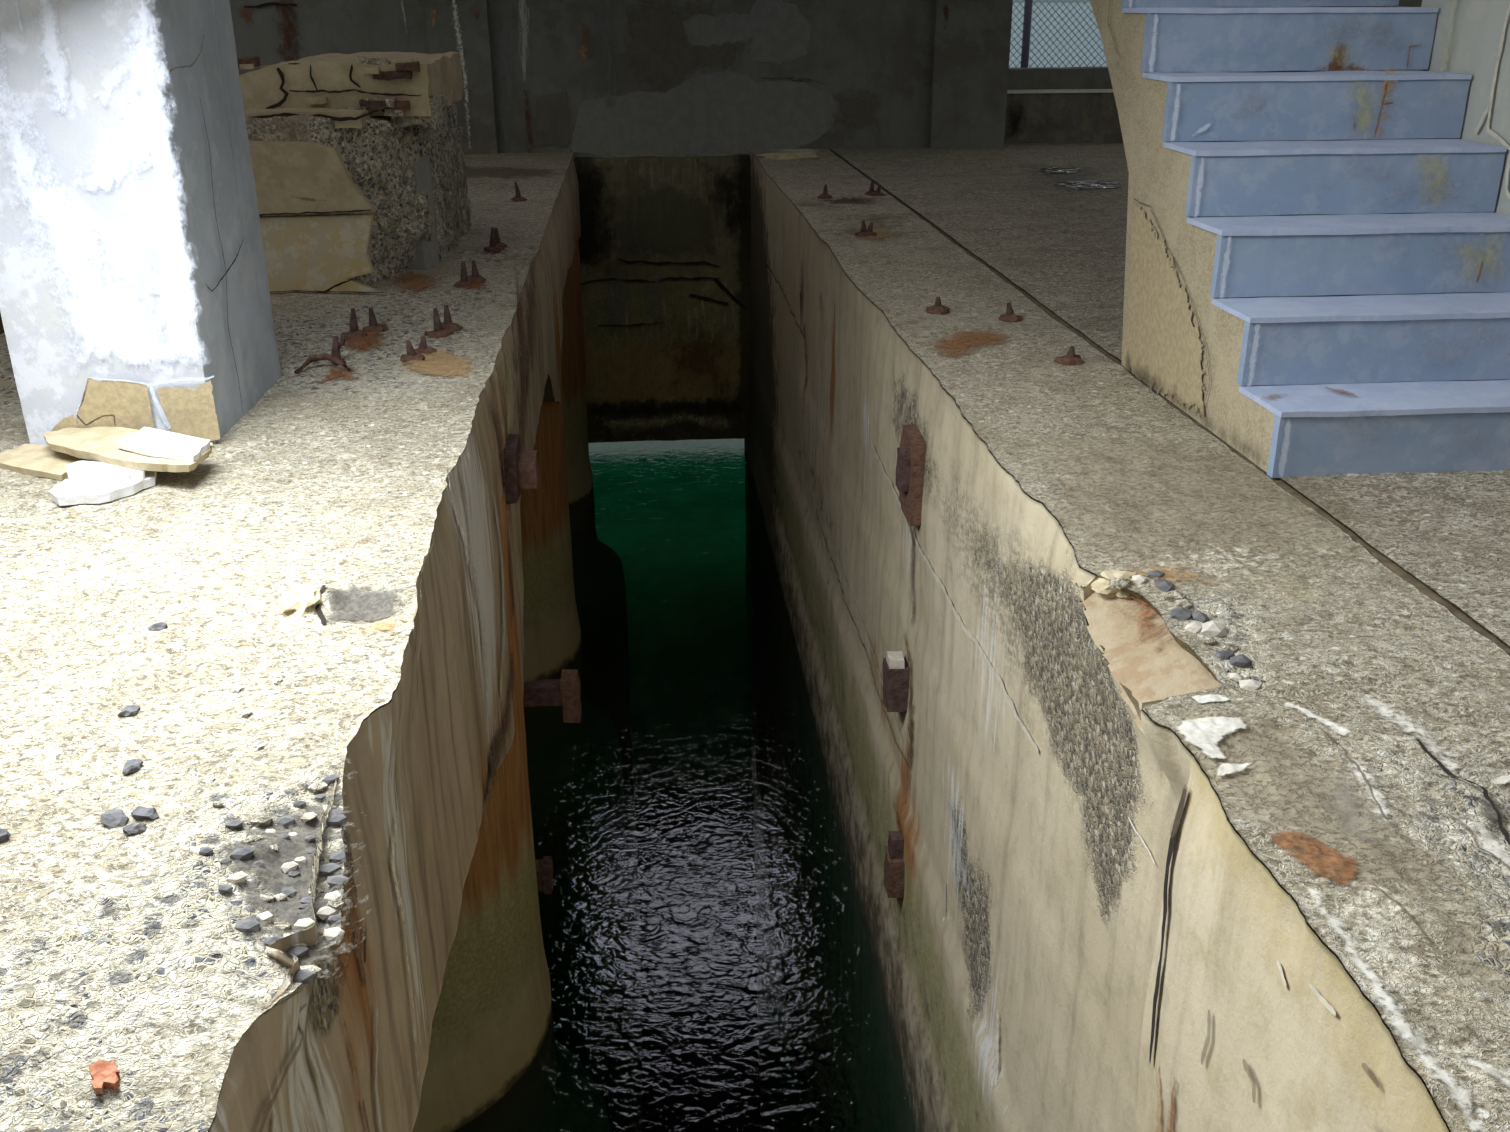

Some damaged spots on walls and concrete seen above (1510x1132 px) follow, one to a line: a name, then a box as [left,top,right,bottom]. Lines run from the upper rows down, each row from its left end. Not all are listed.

peeling [571,70,840,158]
rust [1318,44,1364,71]
rust [1374,68,1397,139]
crack [1474,2,1510,199]
crack [165,3,422,412]
rust [398,329,475,378]
spalling [1067,569,1262,735]
crack [1319,727,1389,821]
crack [1416,738,1510,871]
rust [1271,831,1358,885]
crack [1149,785,1188,1063]
crack [1372,883,1433,945]